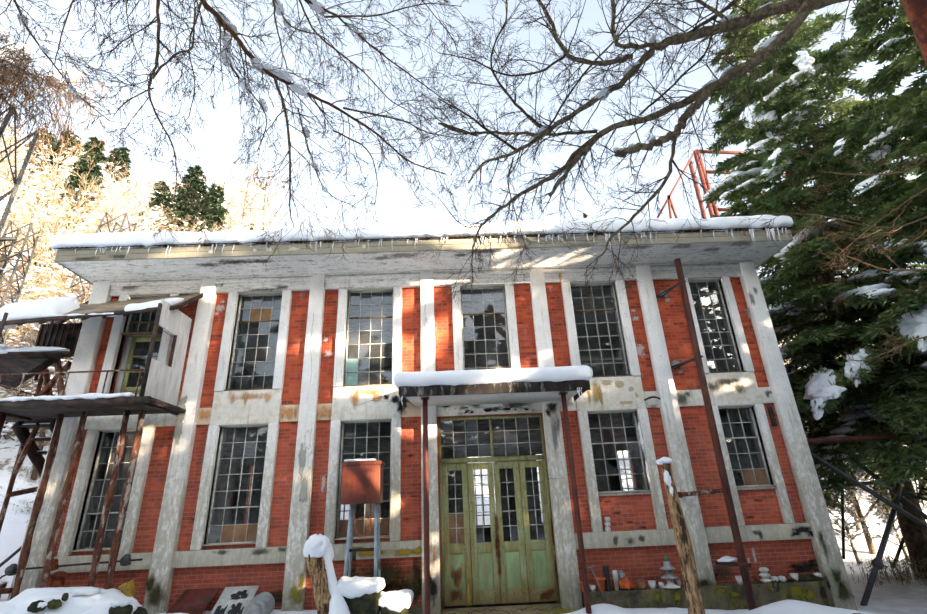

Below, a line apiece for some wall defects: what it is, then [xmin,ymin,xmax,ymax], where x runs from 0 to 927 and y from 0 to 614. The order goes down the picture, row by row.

corrosion [352,390,380,406]
leakage [709,379,743,392]
peeling [299,430,313,502]
leakage [791,526,828,573]
leakage [146,576,164,606]
corrosion [451,553,471,604]
corrosion [540,560,559,600]
leakage [790,570,851,600]